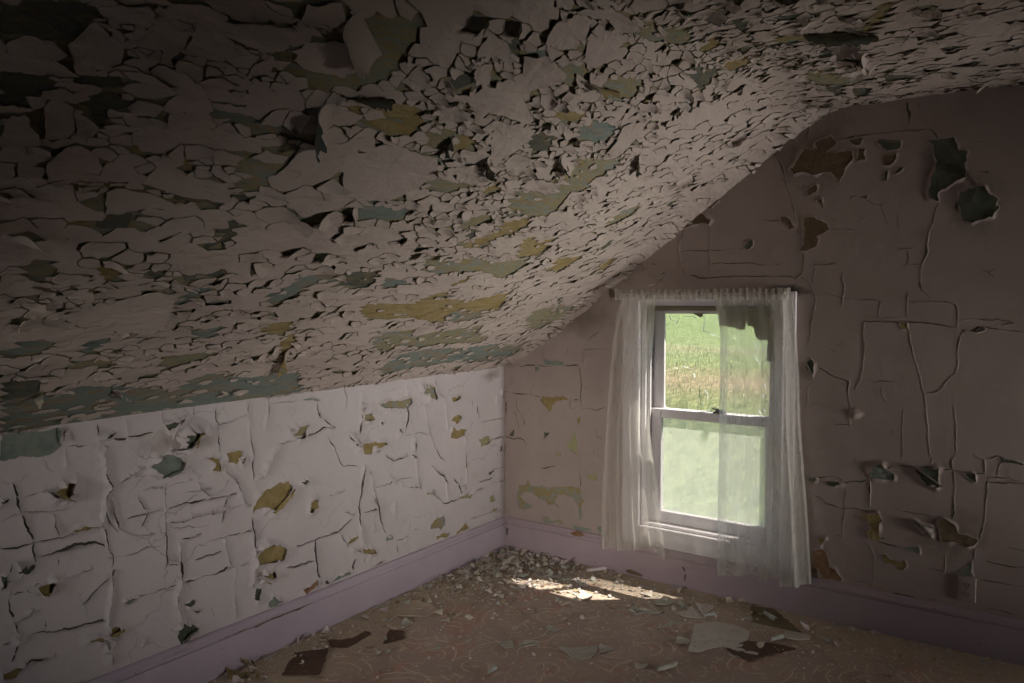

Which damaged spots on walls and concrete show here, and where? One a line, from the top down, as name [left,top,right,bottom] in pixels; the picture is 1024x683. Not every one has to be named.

peeling [0,0,1024,484]
crack [815,203,1024,587]
peeling [35,471,87,510]
peeling [251,474,321,522]
crack [0,348,613,667]
peeling [515,477,585,537]
peeling [912,463,945,493]
peeling [0,562,67,601]
peeling [218,535,321,641]
peeling [810,535,845,583]
peeling [934,515,980,579]
peeling [169,597,204,646]